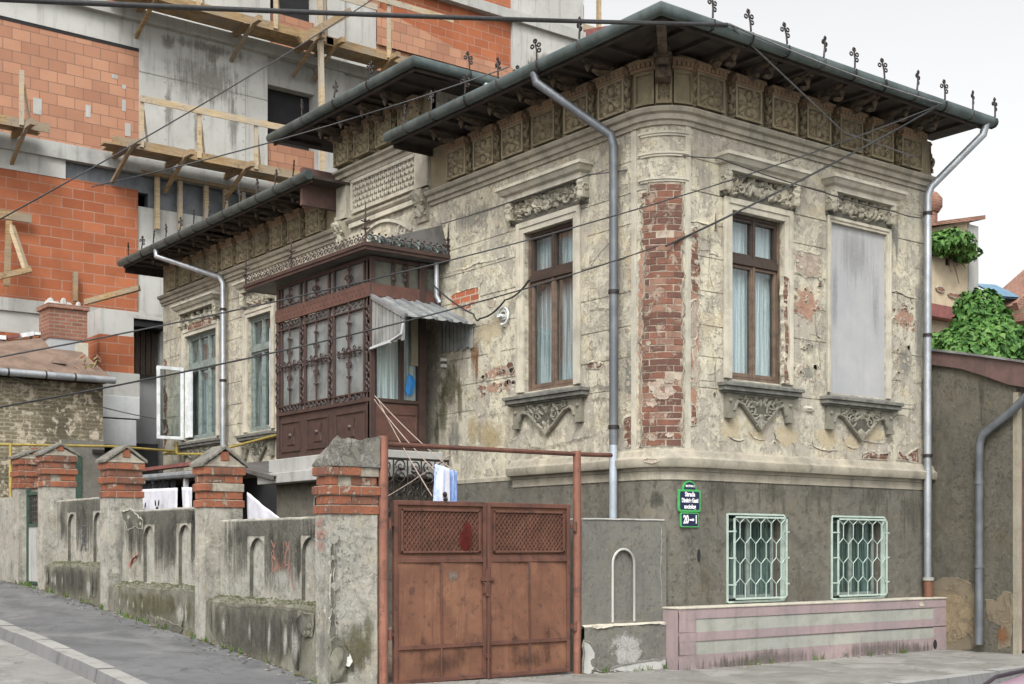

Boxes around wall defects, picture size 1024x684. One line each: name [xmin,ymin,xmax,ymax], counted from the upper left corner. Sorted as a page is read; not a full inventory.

flaking render [451,286,506,341]
flaking render [622,181,701,449]
flaking render [779,249,823,384]
flaking render [478,361,516,398]
damp [435,367,499,454]
damp [118,509,195,563]
damp [209,605,300,658]